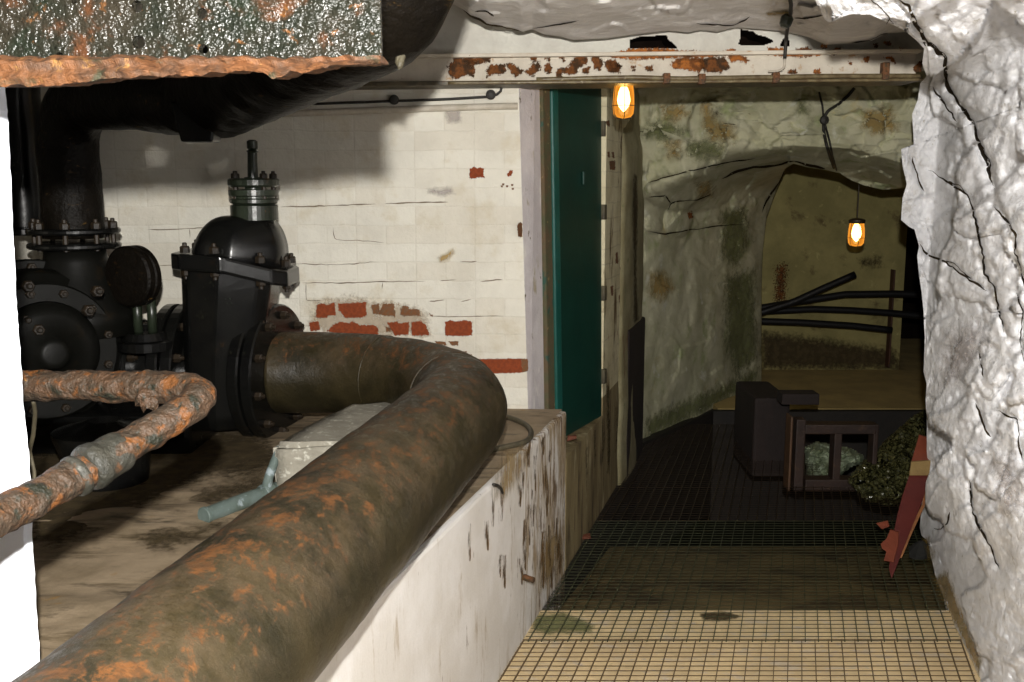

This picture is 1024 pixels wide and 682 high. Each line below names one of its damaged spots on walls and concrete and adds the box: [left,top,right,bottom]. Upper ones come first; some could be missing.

corrosion [446,46,750,79]
flaking render [630,36,677,49]
peeling [469,167,485,179]
crack [647,159,825,235]
crack [854,0,1024,361]
peeling [309,302,528,374]
damp [646,207,900,435]